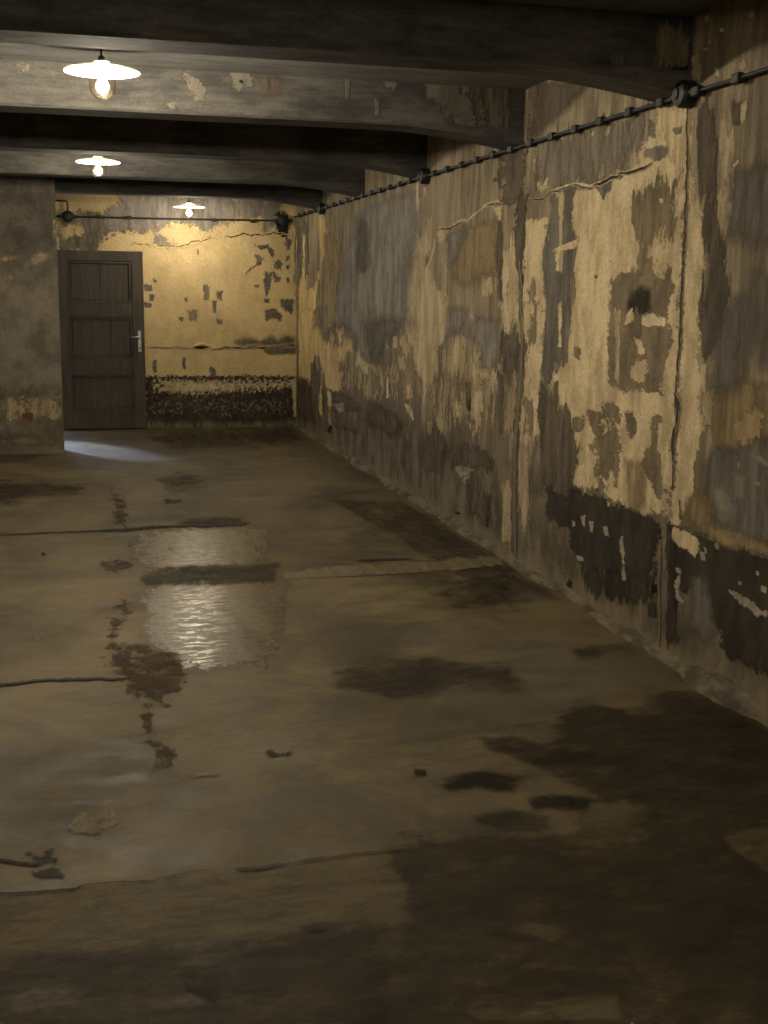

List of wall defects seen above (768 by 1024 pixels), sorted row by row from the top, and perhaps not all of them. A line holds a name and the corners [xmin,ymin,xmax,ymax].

peeling [425,84,488,127]
crack [528,162,652,201]
crack [437,199,504,230]
crack [130,232,291,276]
peeling [144,278,157,308]
peeling [179,285,223,324]
damp [321,192,417,363]
peeling [254,100,747,552]
damp [146,361,494,530]
crack [0,512,250,535]
crack [0,676,130,686]
damp [0,691,768,1024]